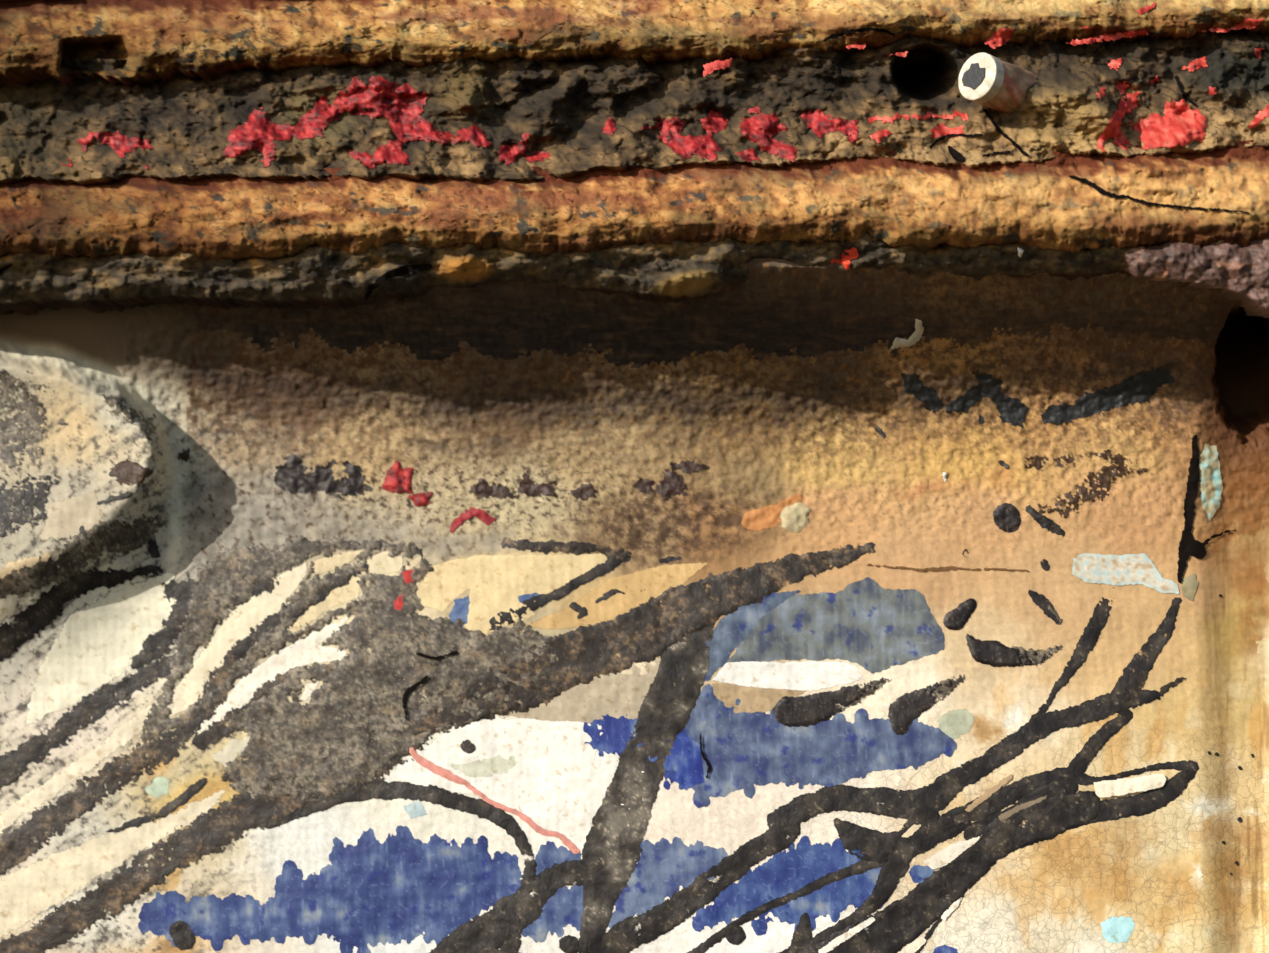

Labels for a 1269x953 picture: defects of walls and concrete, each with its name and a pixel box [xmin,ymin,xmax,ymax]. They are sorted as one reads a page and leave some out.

corrosion [0,0,1269,87]
peeling [703,58,733,77]
peeling [1068,2,1156,46]
peeling [1181,56,1208,72]
peeling [60,130,154,169]
peeling [223,76,551,169]
peeling [637,106,798,162]
peeling [800,109,968,143]
peeling [1096,58,1207,152]
corrosion [0,139,1269,261]
crack [1069,175,1250,214]
leakage [142,257,1254,483]